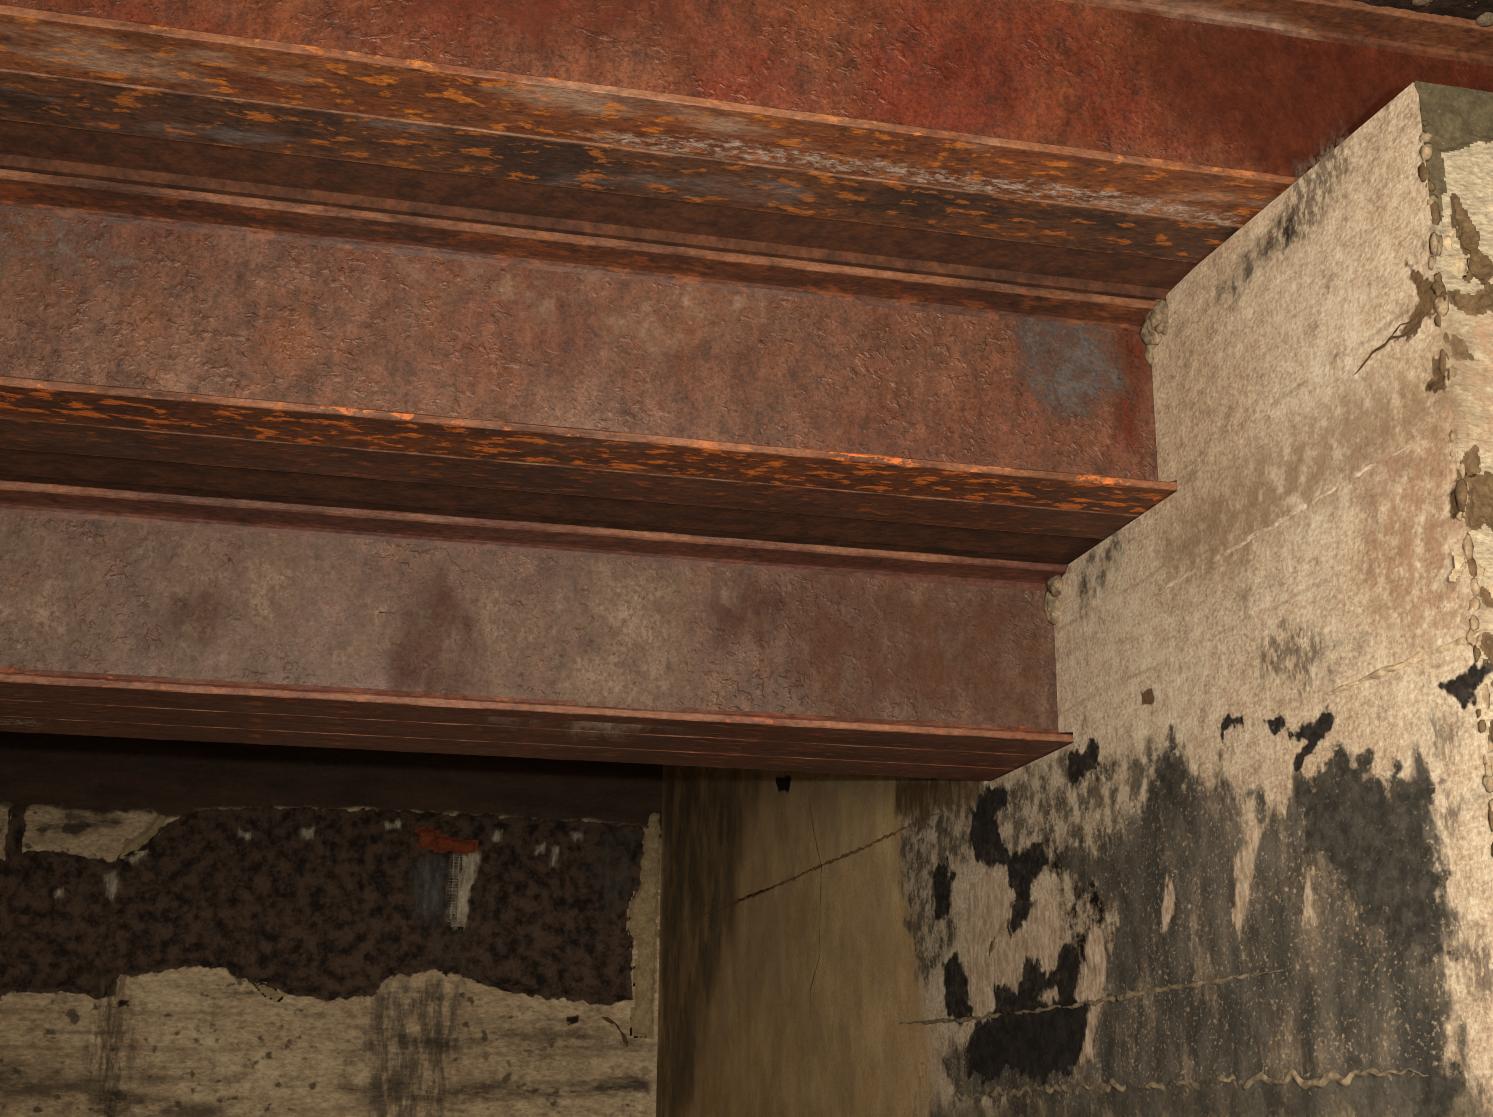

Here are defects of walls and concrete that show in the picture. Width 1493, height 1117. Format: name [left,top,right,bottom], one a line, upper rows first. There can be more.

rust [1138,13,1454,160]
flaking render [1395,80,1493,399]
crack [1354,315,1425,375]
spalling [1449,429,1493,857]
spalling [1434,728,1454,745]
spalling [1445,803,1461,828]
spalling [0,806,645,1006]
spalling [1458,942,1493,992]